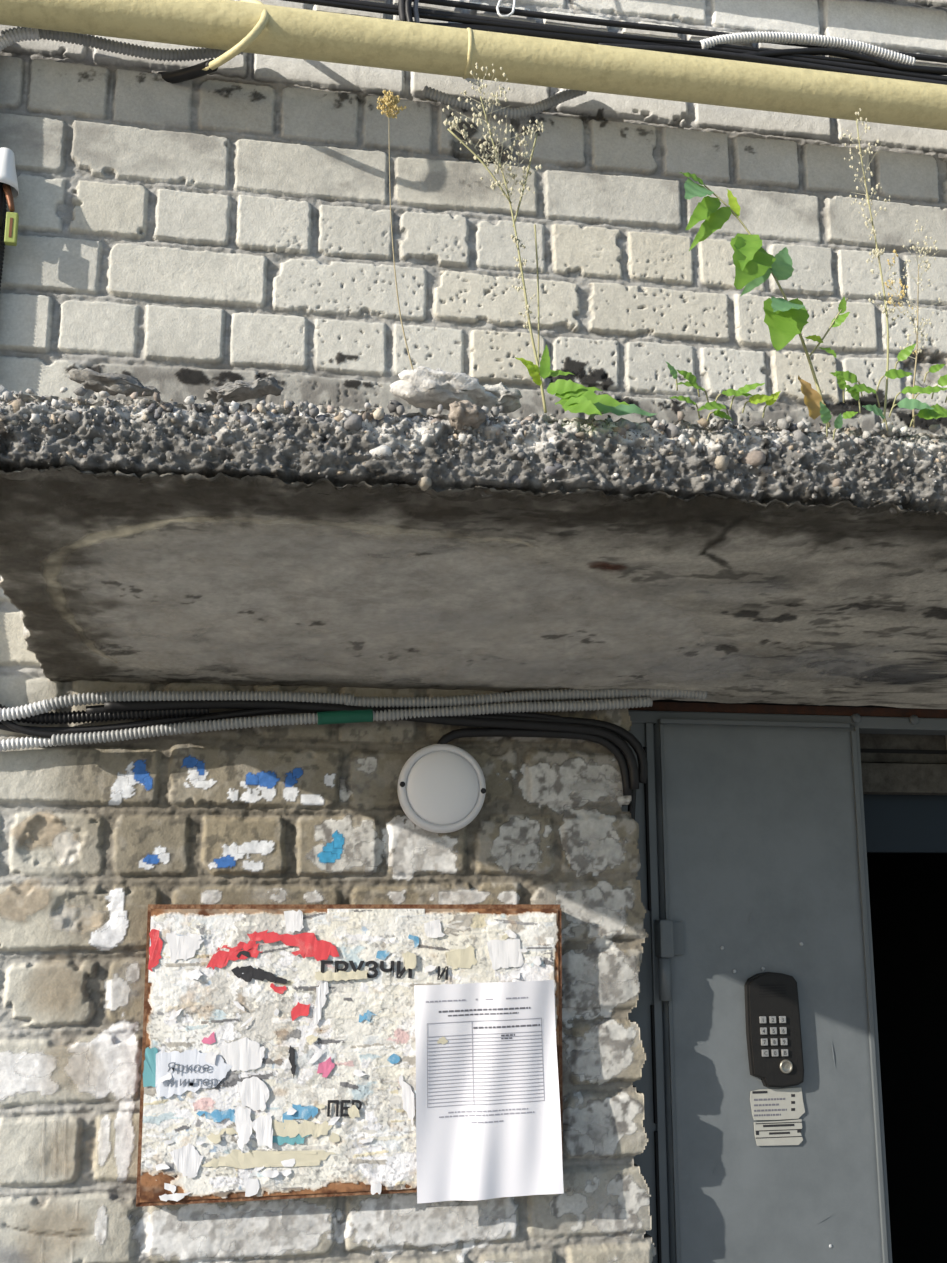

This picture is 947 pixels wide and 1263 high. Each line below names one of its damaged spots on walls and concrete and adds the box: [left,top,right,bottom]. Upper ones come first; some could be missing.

spalling [0,385,947,514]
leakage [0,416,947,685]